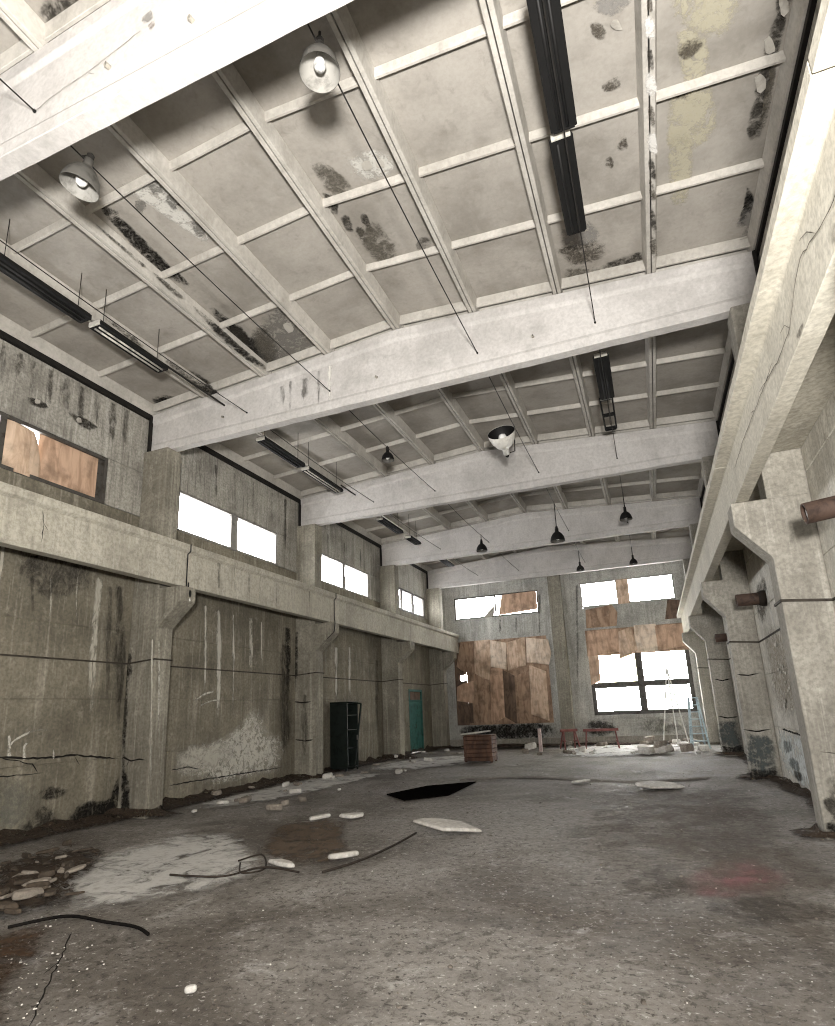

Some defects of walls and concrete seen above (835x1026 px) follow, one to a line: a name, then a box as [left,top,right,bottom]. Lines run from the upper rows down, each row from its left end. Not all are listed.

spalling [747,0,789,137]
peeling [315,165,350,206]
peeling [350,150,393,179]
water stain [48,370,96,424]
water stain [21,553,132,823]
water stain [719,722,809,786]
water stain [592,784,835,937]